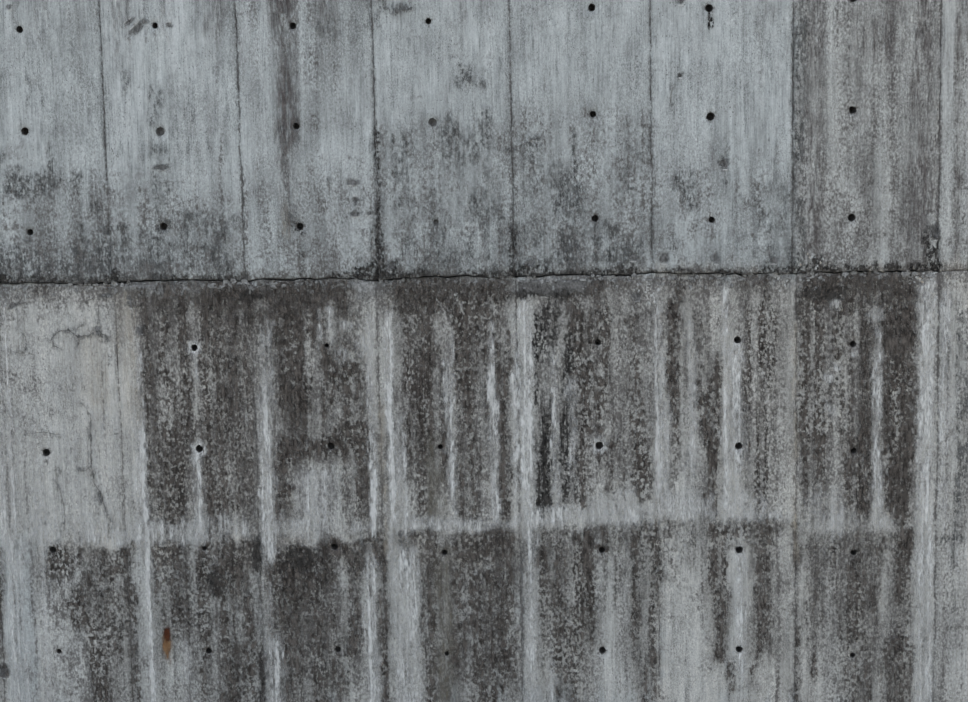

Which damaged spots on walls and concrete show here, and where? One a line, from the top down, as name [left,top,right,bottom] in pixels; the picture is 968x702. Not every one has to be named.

leakage [363,0,412,26]
leakage [791,0,824,94]
leakage [911,0,935,121]
leakage [277,61,303,235]
leakage [441,111,488,168]
leakage [793,110,824,176]
crack [51,296,109,348]
leakage [939,292,960,449]
leakage [0,133,941,702]
leakage [953,428,968,502]
rust [162,627,171,659]